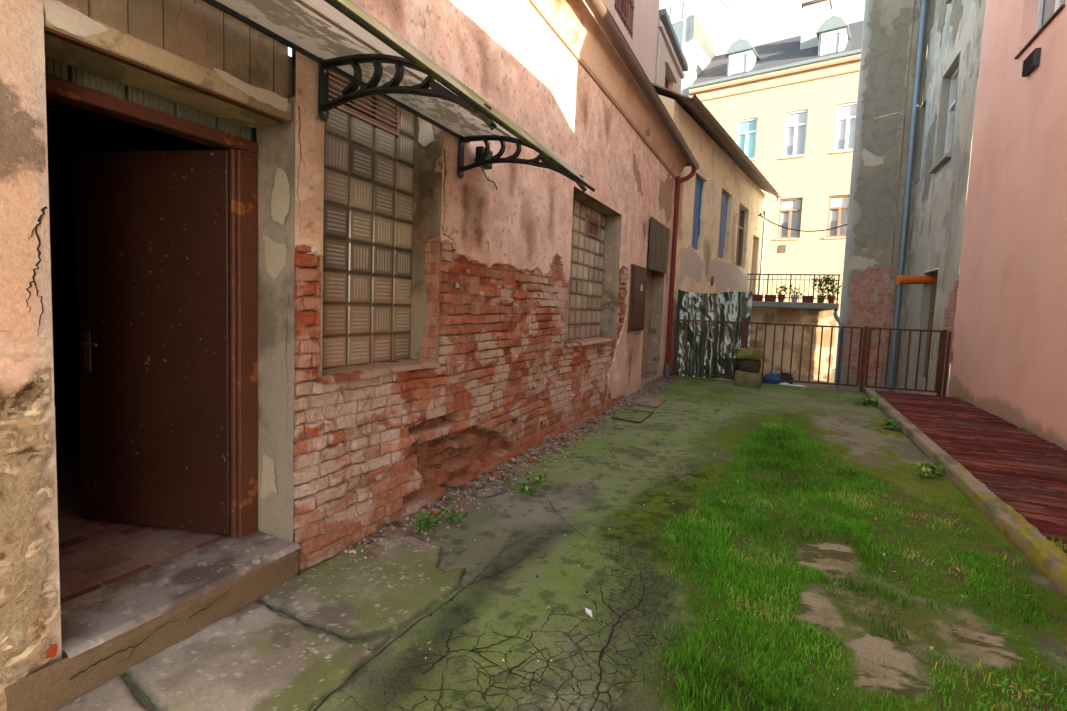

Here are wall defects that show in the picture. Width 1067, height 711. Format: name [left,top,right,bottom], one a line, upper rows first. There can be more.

flaking render [936,0,963,47]
crack [26,206,47,330]
peeling [271,167,290,225]
flaking render [842,7,920,385]
flaking render [921,113,953,235]
flaking render [260,235,628,573]
flaking render [0,368,57,683]
crack [313,480,684,711]